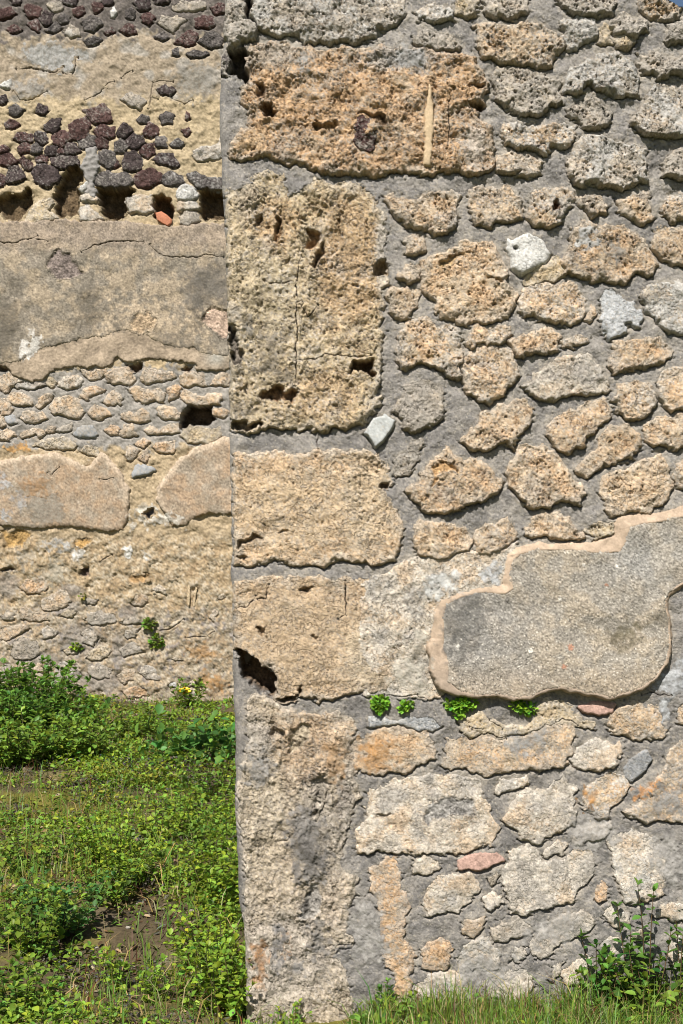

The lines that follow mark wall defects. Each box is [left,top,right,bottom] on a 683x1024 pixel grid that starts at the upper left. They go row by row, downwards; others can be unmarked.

crack [0,234,48,246]
crack [81,238,223,260]
spalling [233,647,303,704]